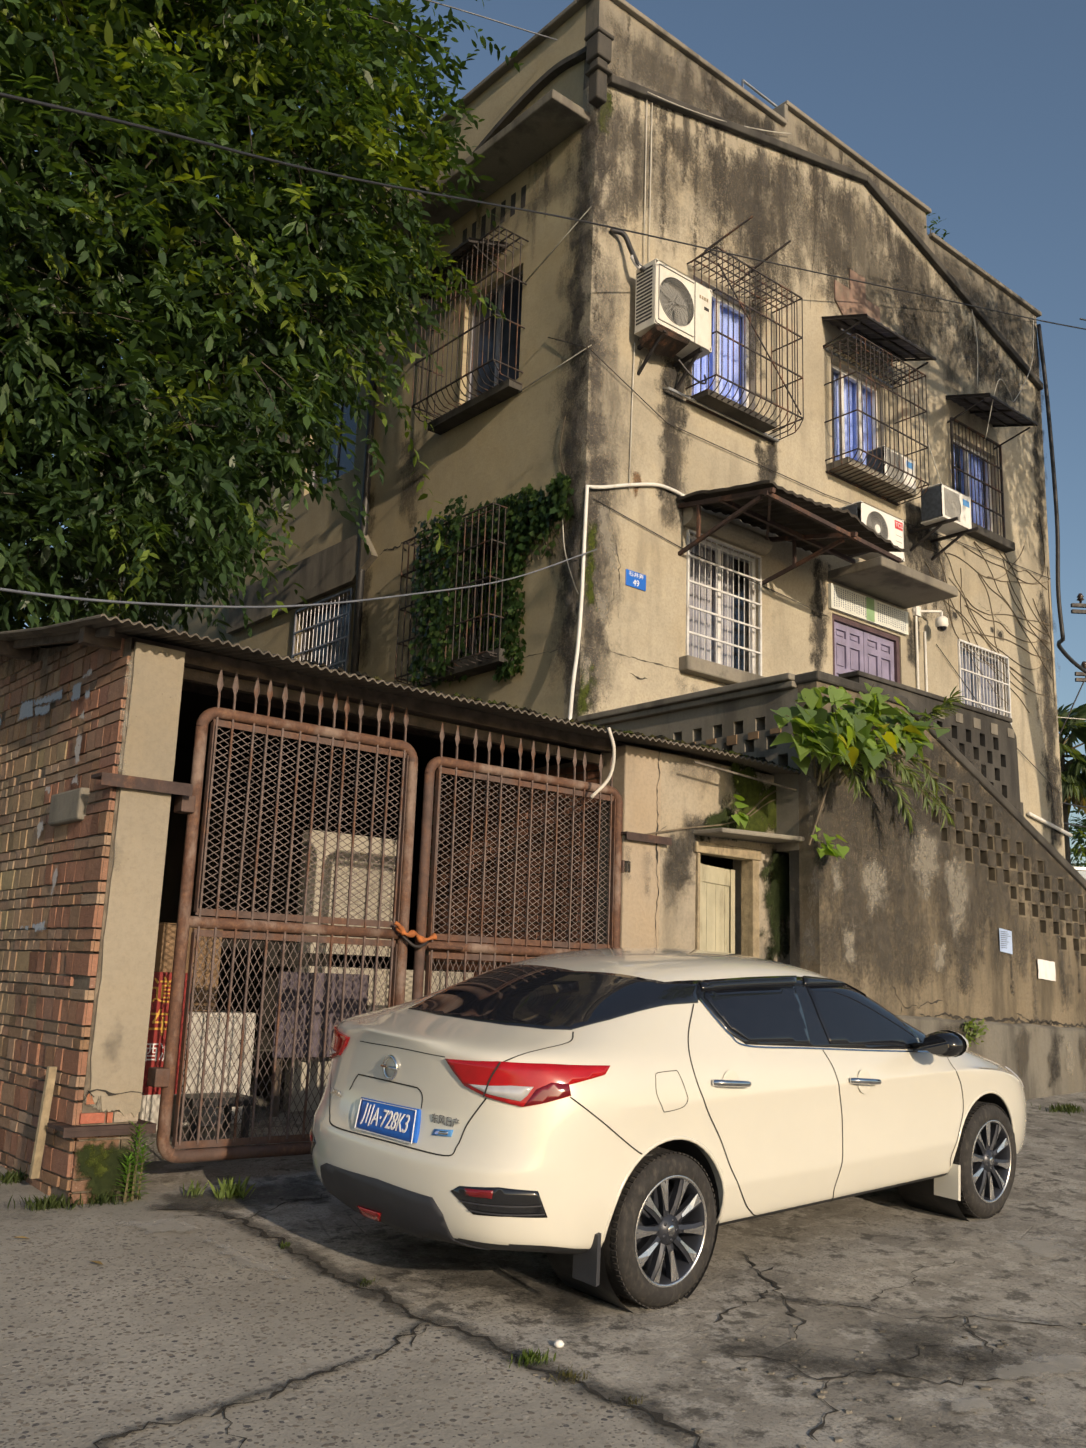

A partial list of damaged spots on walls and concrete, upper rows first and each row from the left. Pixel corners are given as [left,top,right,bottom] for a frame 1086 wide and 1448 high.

damp [633,97,853,379]
damp [558,109,612,711]
damp [876,211,1046,582]
peeling [18,669,92,784]
damp [800,593,1086,997]
flaking render [69,1094,139,1205]
damp [1017,1019,1037,1075]
damp [1048,1037,1063,1087]